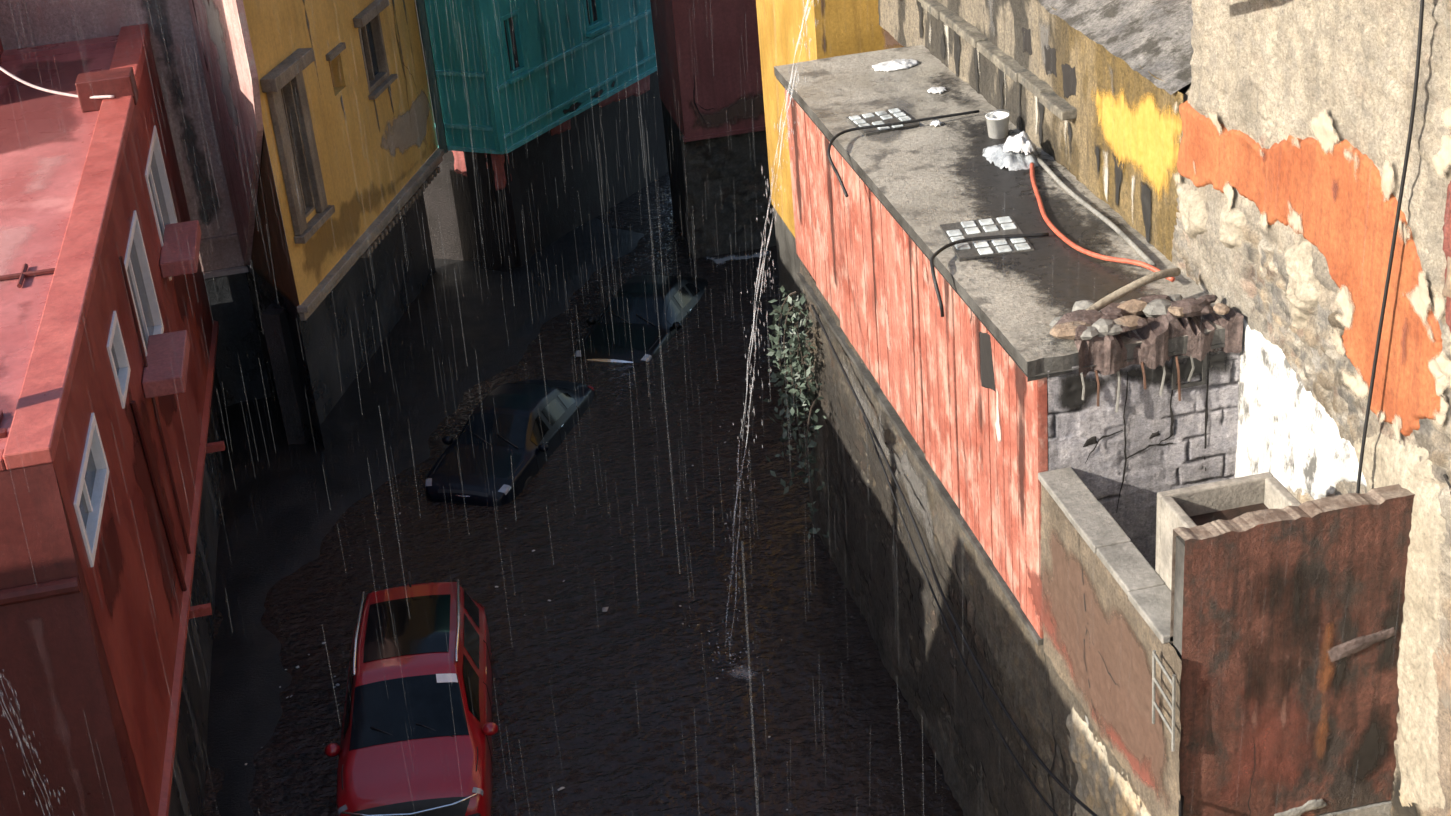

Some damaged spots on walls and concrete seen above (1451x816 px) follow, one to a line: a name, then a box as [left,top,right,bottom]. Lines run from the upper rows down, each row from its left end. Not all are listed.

spalling [1021,27,1077,98]
peeling [1096,91,1451,440]
crack [1085,351,1211,513]
peeling [1049,267,1367,500]
corrosion [1316,714,1327,757]
corrosion [1320,624,1333,691]